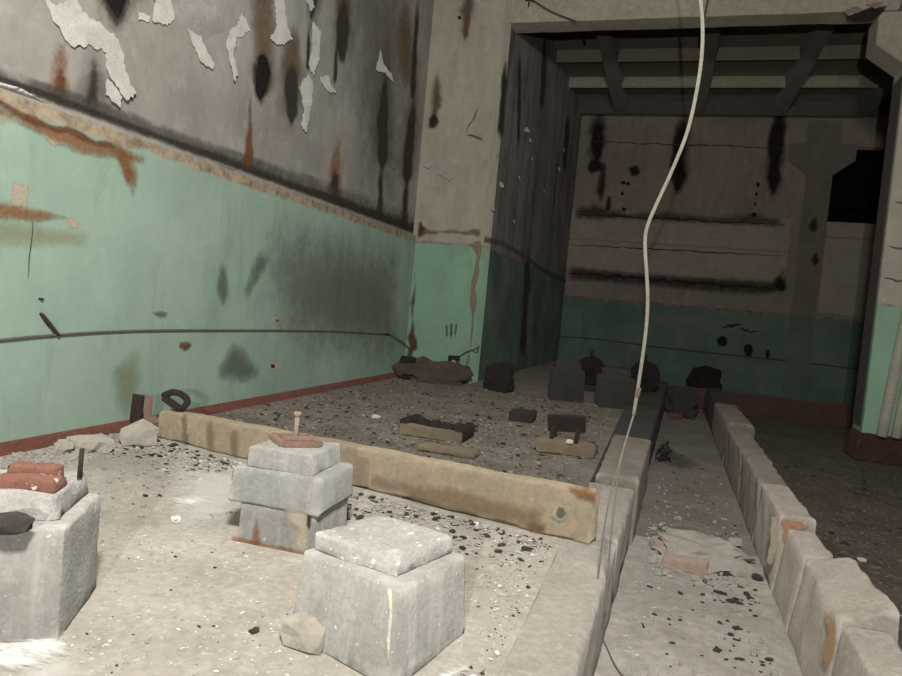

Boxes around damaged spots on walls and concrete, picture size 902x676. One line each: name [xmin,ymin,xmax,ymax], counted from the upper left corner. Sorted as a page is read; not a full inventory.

rust [52,52,66,102]
peeling [45,0,137,108]
peeling [270,0,315,45]
peeling [299,22,337,132]
rust [458,0,472,37]
rust [0,100,139,184]
water stain [377,83,388,167]
water stain [403,106,415,183]
water stain [768,119,785,193]
rust [0,205,51,220]
water stain [225,352,252,376]